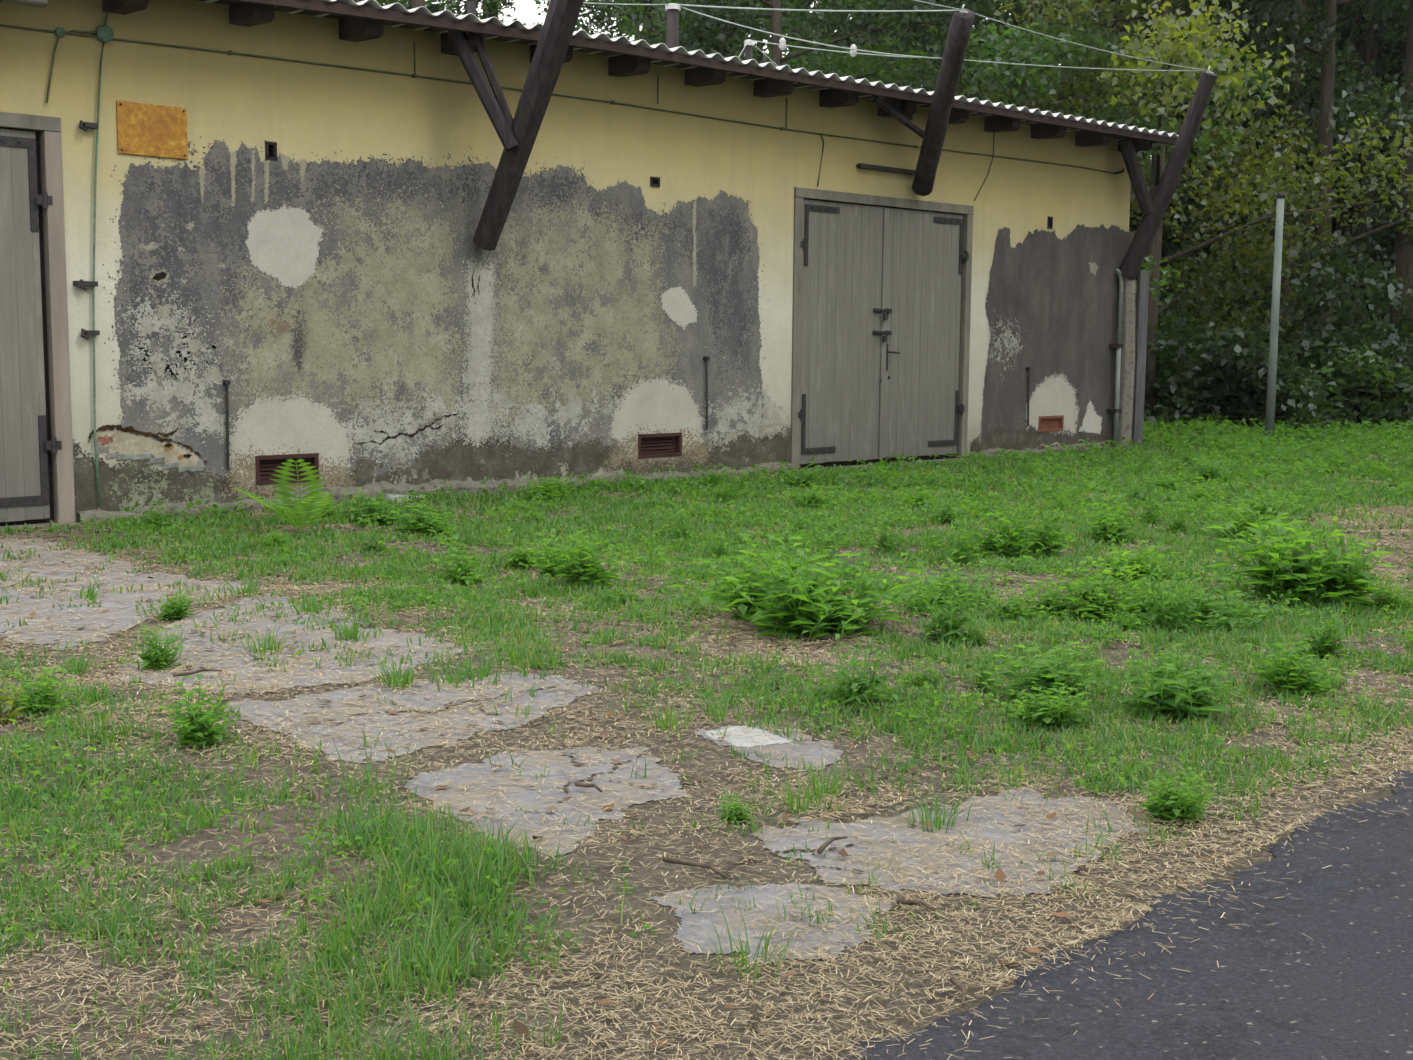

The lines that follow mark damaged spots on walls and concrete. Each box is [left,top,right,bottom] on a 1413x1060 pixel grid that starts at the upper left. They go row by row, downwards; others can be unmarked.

crack [354,414,457,445]
peeling [93,140,765,483]
peeling [980,223,1136,450]